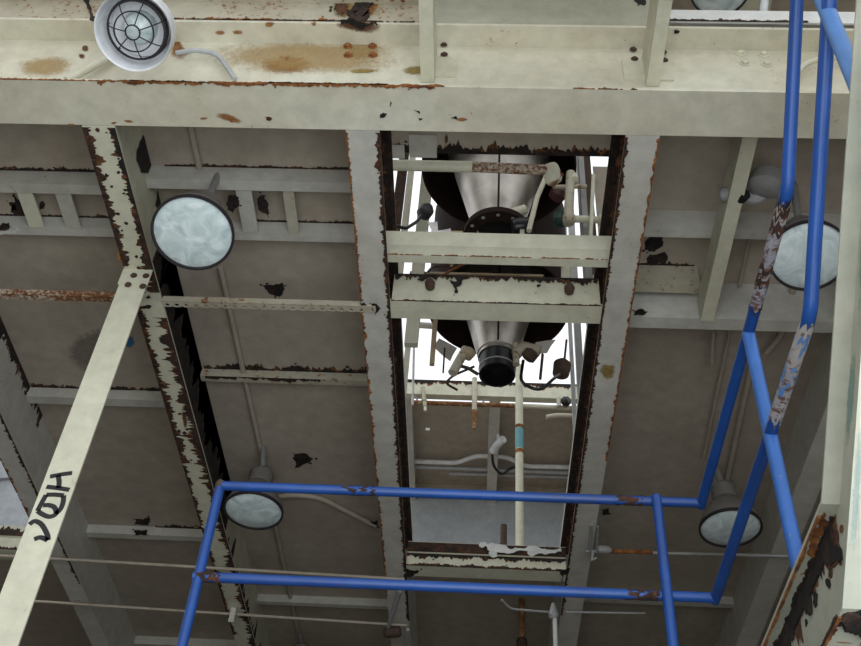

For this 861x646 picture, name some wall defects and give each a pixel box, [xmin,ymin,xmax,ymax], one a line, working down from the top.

corrosion [174,2,415,32]
corrosion [0,44,444,90]
corrosion [0,120,694,646]
peeling [479,542,562,558]